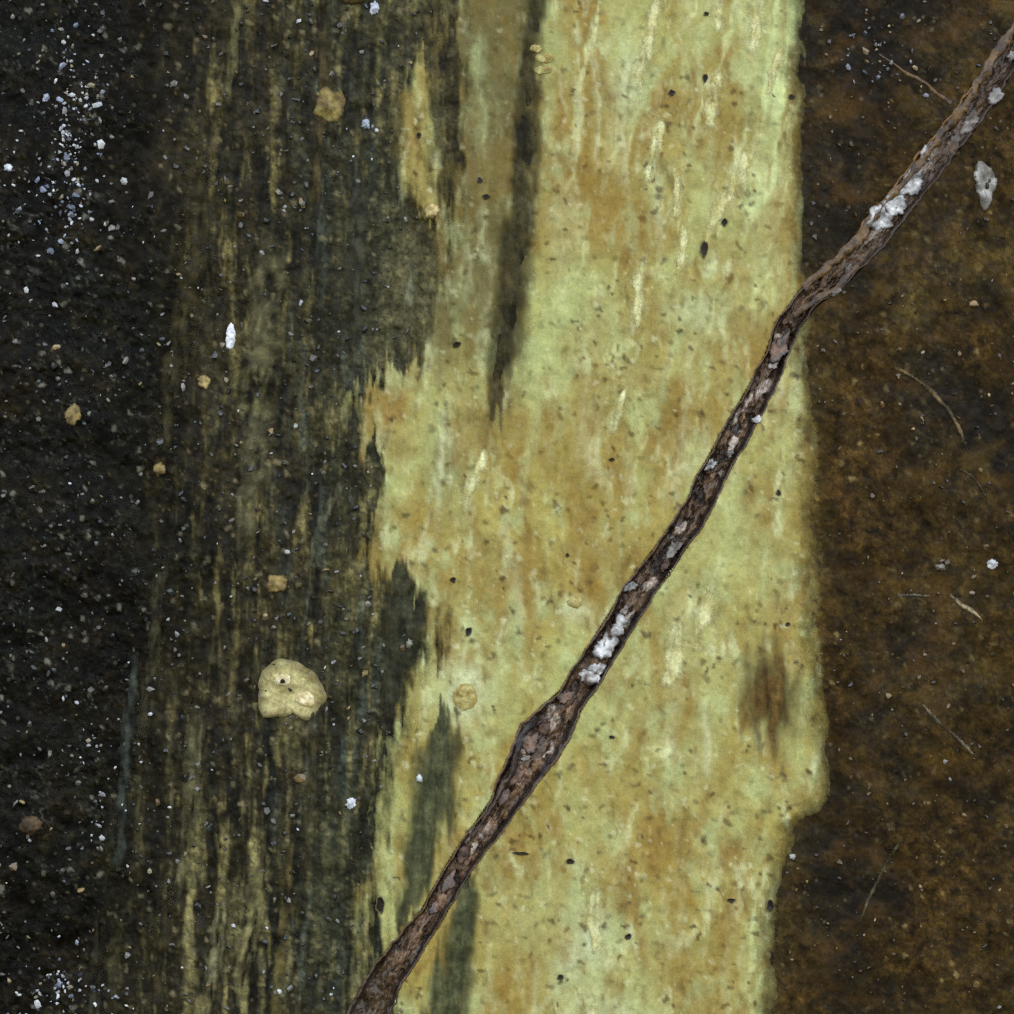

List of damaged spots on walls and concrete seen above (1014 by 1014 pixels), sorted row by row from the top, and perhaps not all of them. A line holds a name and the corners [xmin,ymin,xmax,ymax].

damp [225,0,242,98]
damp [236,254,287,541]
damp [343,0,825,1014]
crack [346,22,1014,1014]
damp [194,903,226,1014]
damp [234,867,268,1014]
damp [271,844,293,1014]